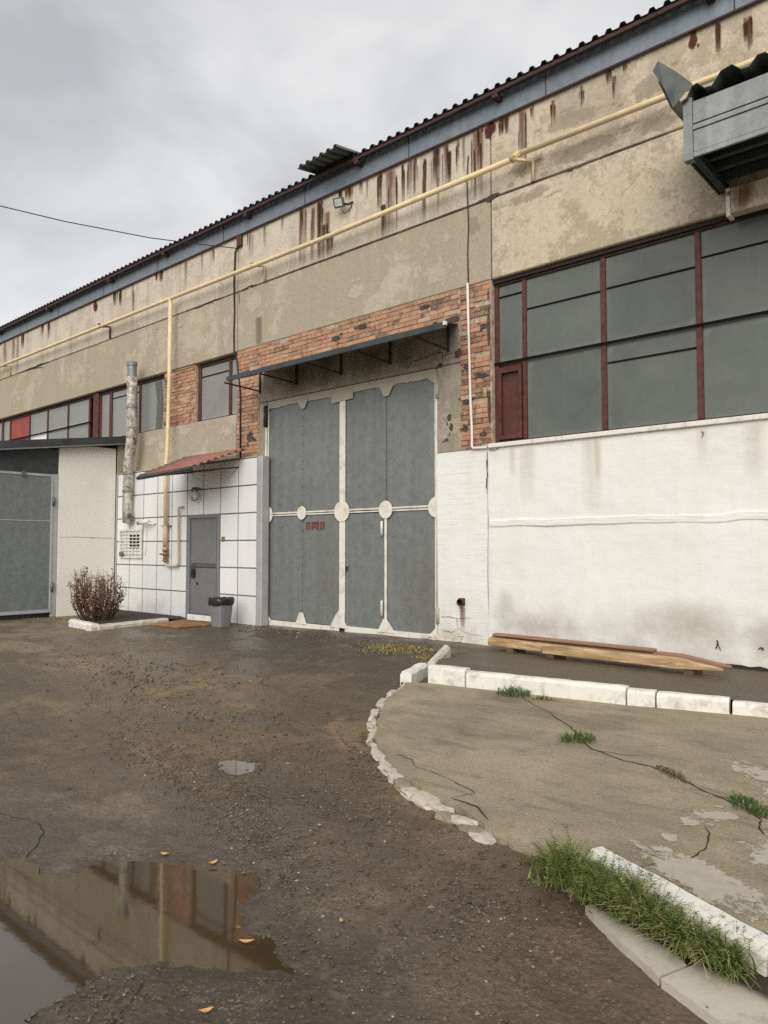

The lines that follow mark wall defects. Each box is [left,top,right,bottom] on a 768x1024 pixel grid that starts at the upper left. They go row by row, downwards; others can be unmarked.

rust [743,16,753,43]
rust [498,106,533,148]
rust [339,131,482,228]
rust [299,201,333,248]
peeling [215,423,256,447]
crack [399,754,489,820]
crack [520,697,768,836]
peeling [722,760,768,797]
crack [0,813,44,858]
crack [684,827,710,859]
peeling [680,805,740,827]
peeling [625,833,768,933]